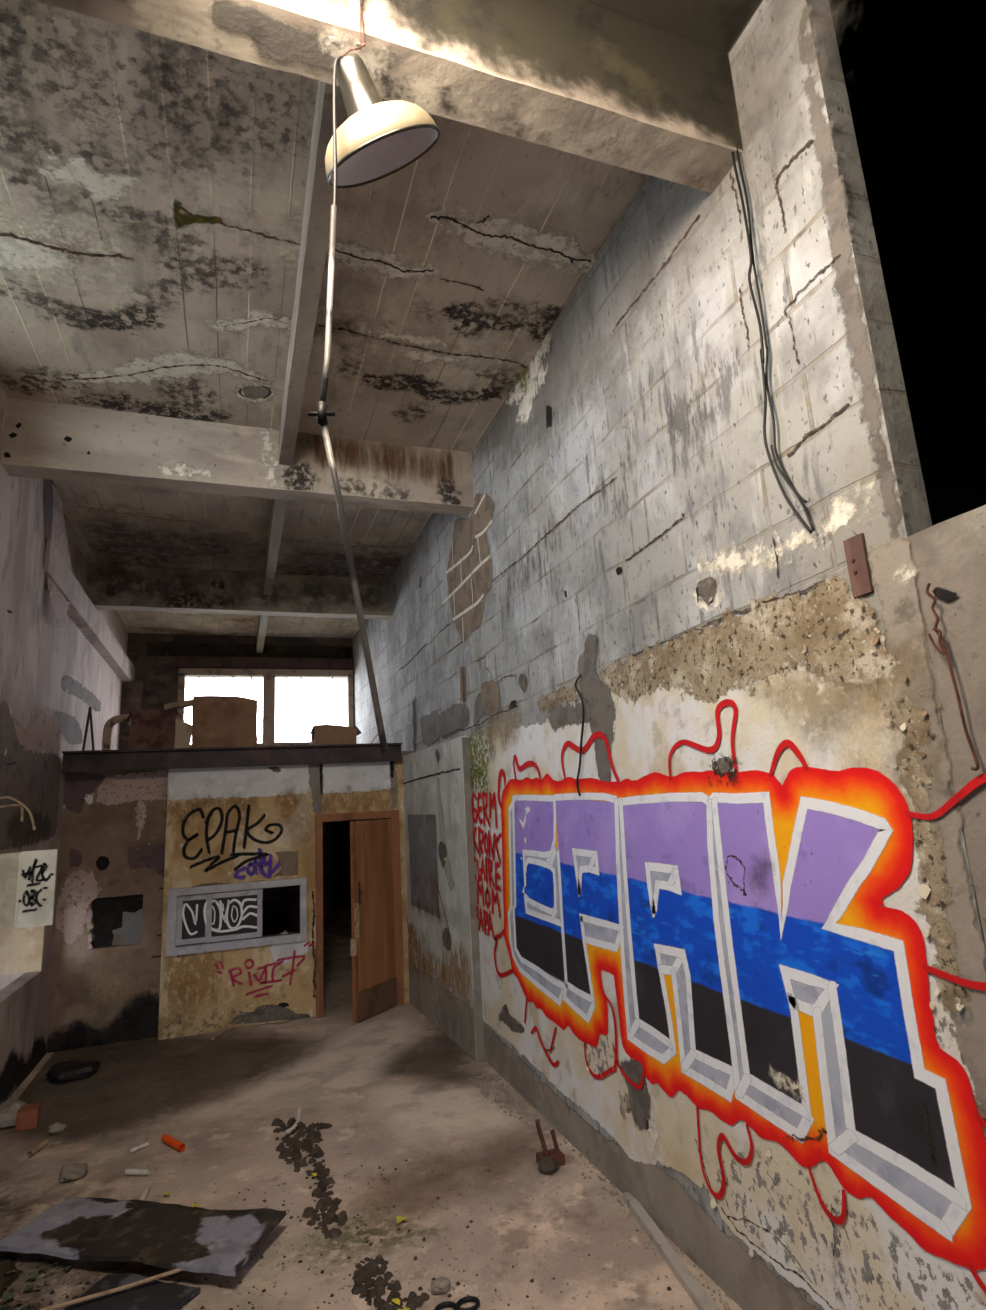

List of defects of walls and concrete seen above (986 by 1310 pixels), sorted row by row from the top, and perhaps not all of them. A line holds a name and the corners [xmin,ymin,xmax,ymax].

leakage [0,4,304,331]
crack [0,232,134,262]
crack [172,200,483,291]
crack [783,254,841,364]
leakage [0,366,232,422]
leakage [341,300,562,424]
crack [787,403,849,457]
leakage [87,519,402,609]
flaking render [481,674,582,716]
flaking render [598,573,973,1044]
flaking render [127,843,165,877]
spalling [85,909,94,950]